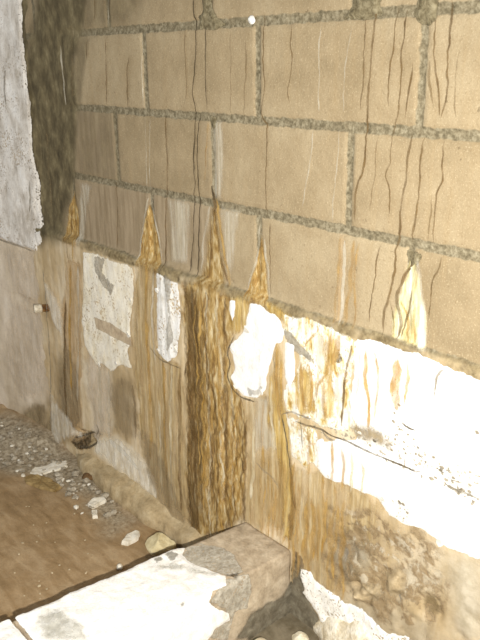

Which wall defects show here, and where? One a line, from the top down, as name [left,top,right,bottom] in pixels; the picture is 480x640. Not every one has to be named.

flaking render [0,0,44,252]
rust [62,192,85,442]
peeling [82,252,134,371]
peeling [155,273,181,362]
rust [135,188,377,592]
crack [281,412,425,472]
peeling [230,303,480,640]
water stain [383,210,431,348]